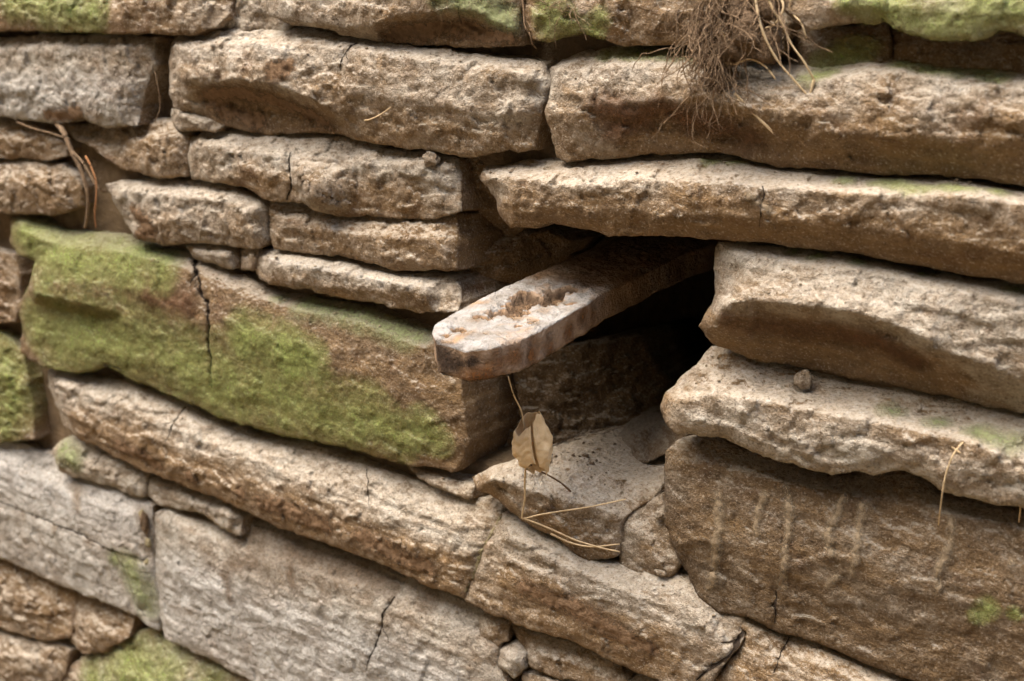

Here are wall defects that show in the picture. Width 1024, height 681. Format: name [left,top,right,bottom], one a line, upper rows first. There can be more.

crack [190,259,212,388]
crack [366,596,395,670]
crack [696,590,790,680]